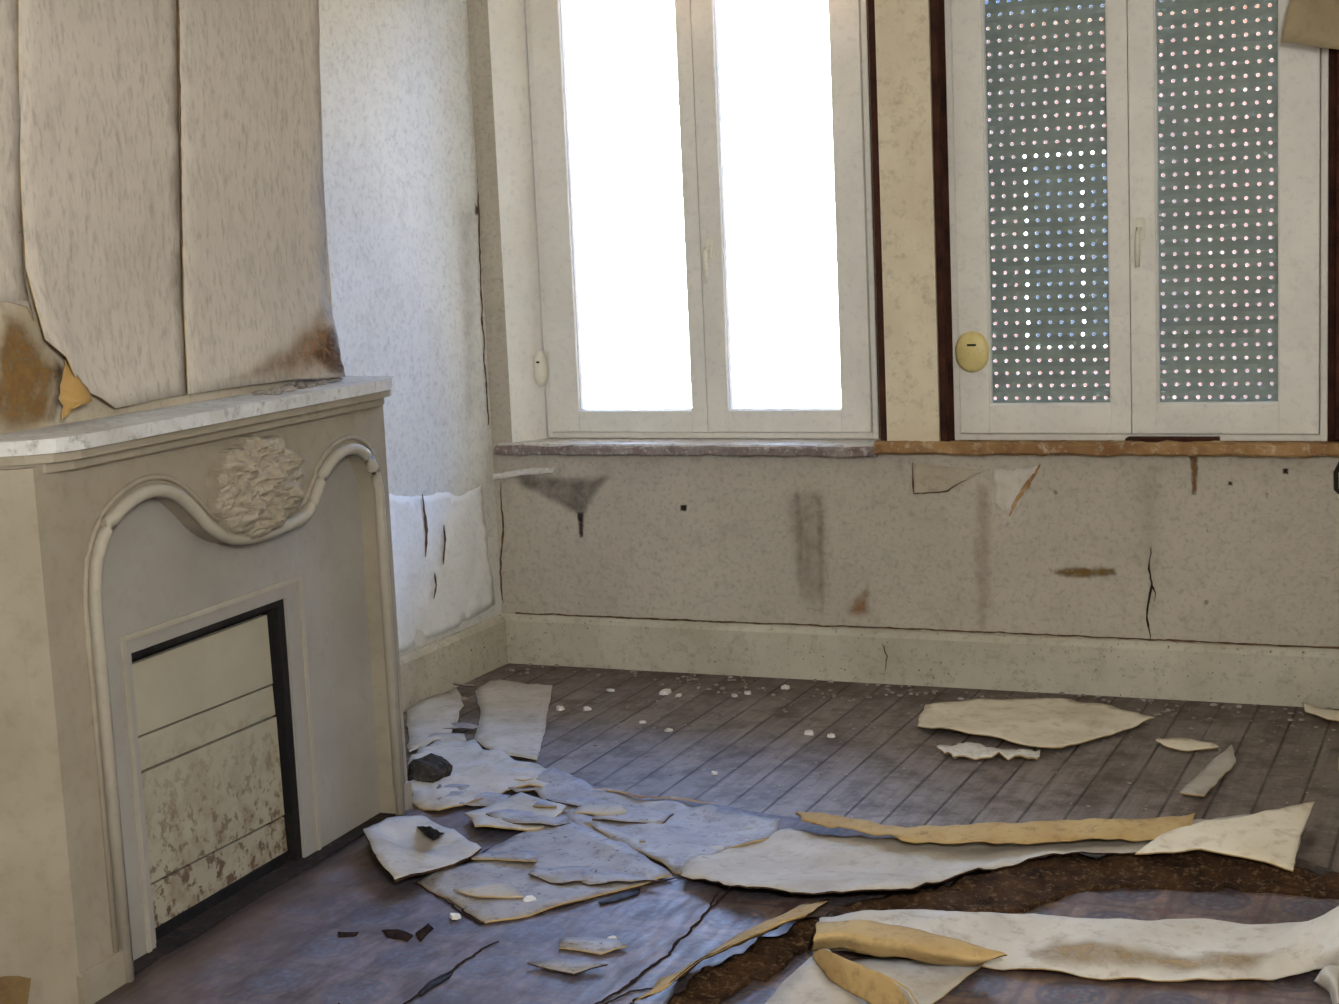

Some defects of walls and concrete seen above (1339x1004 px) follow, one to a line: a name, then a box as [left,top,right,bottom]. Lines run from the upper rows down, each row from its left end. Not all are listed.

peeling [422,494,446,597]
damp [522,476,601,537]
crack [499,483,1339,670]
peeling [912,462,1041,527]
crack [403,853,680,1004]
crack [595,887,733,1004]